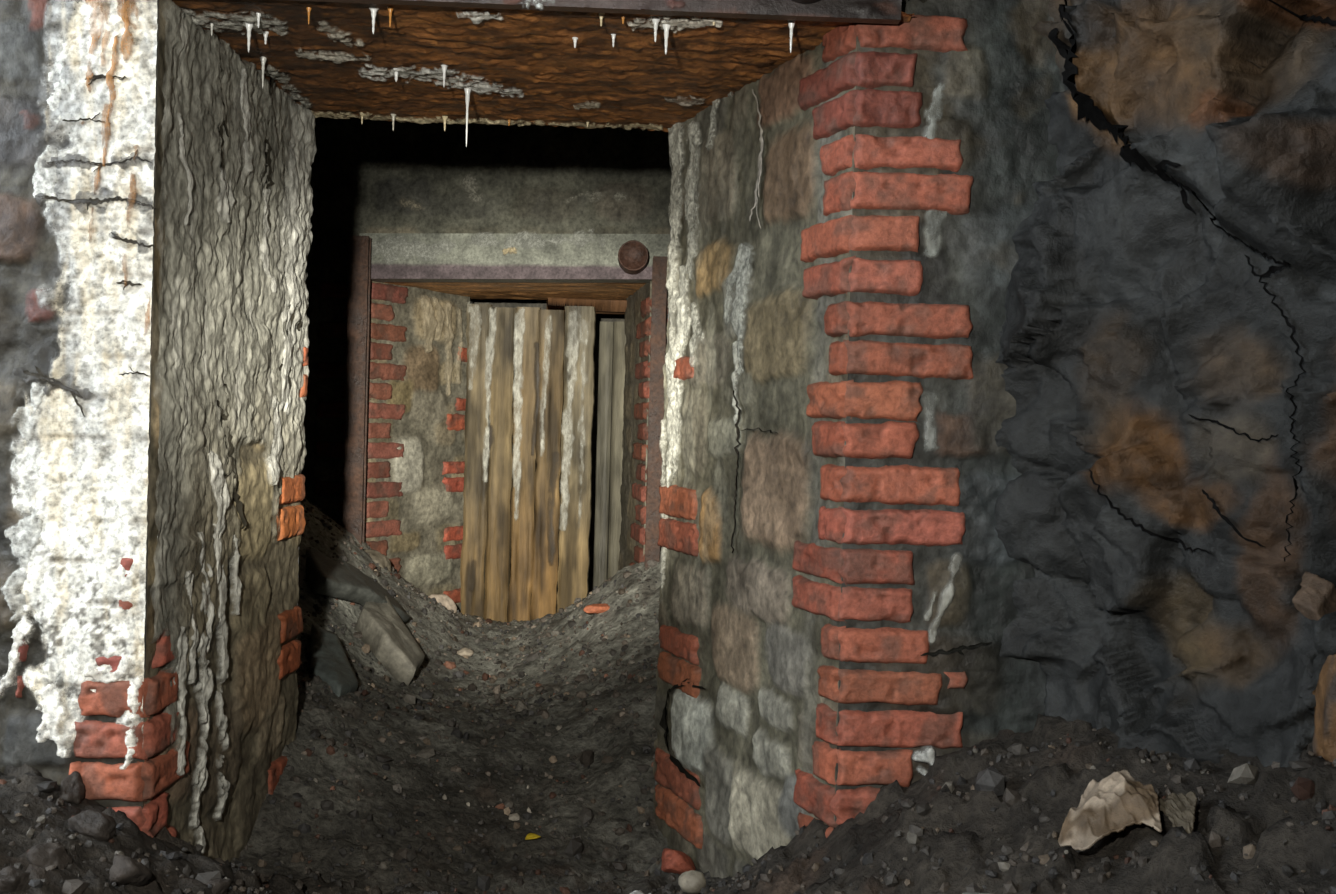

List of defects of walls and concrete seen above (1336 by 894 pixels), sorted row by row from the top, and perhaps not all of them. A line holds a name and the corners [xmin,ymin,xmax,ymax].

crack [62,74,127,123]
rust [86,0,138,189]
crack [35,149,155,290]
rust [127,176,137,217]
crack [1048,0,1306,561]
leakage [0,0,731,854]